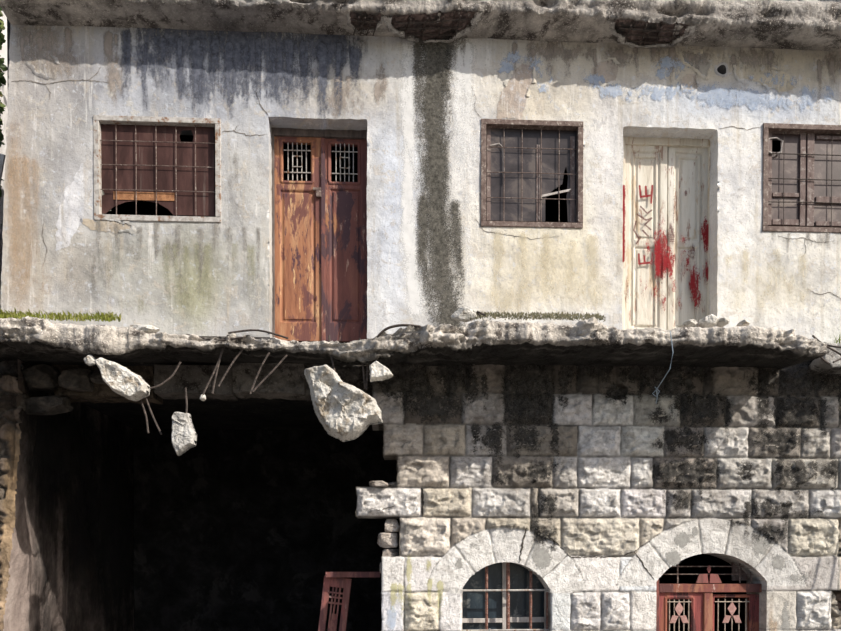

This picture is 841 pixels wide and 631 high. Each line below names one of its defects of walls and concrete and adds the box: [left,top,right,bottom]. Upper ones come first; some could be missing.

spalling [346,10,482,43]
crack [11,66,108,100]
damp [104,28,366,125]
spalling [585,19,834,112]
damp [398,37,478,328]
spalling [90,369,107,385]
spalling [201,329,288,395]
spalling [377,324,421,338]
damp [378,363,489,424]
damp [471,364,731,511]
damp [728,360,841,544]
damp [531,494,558,551]